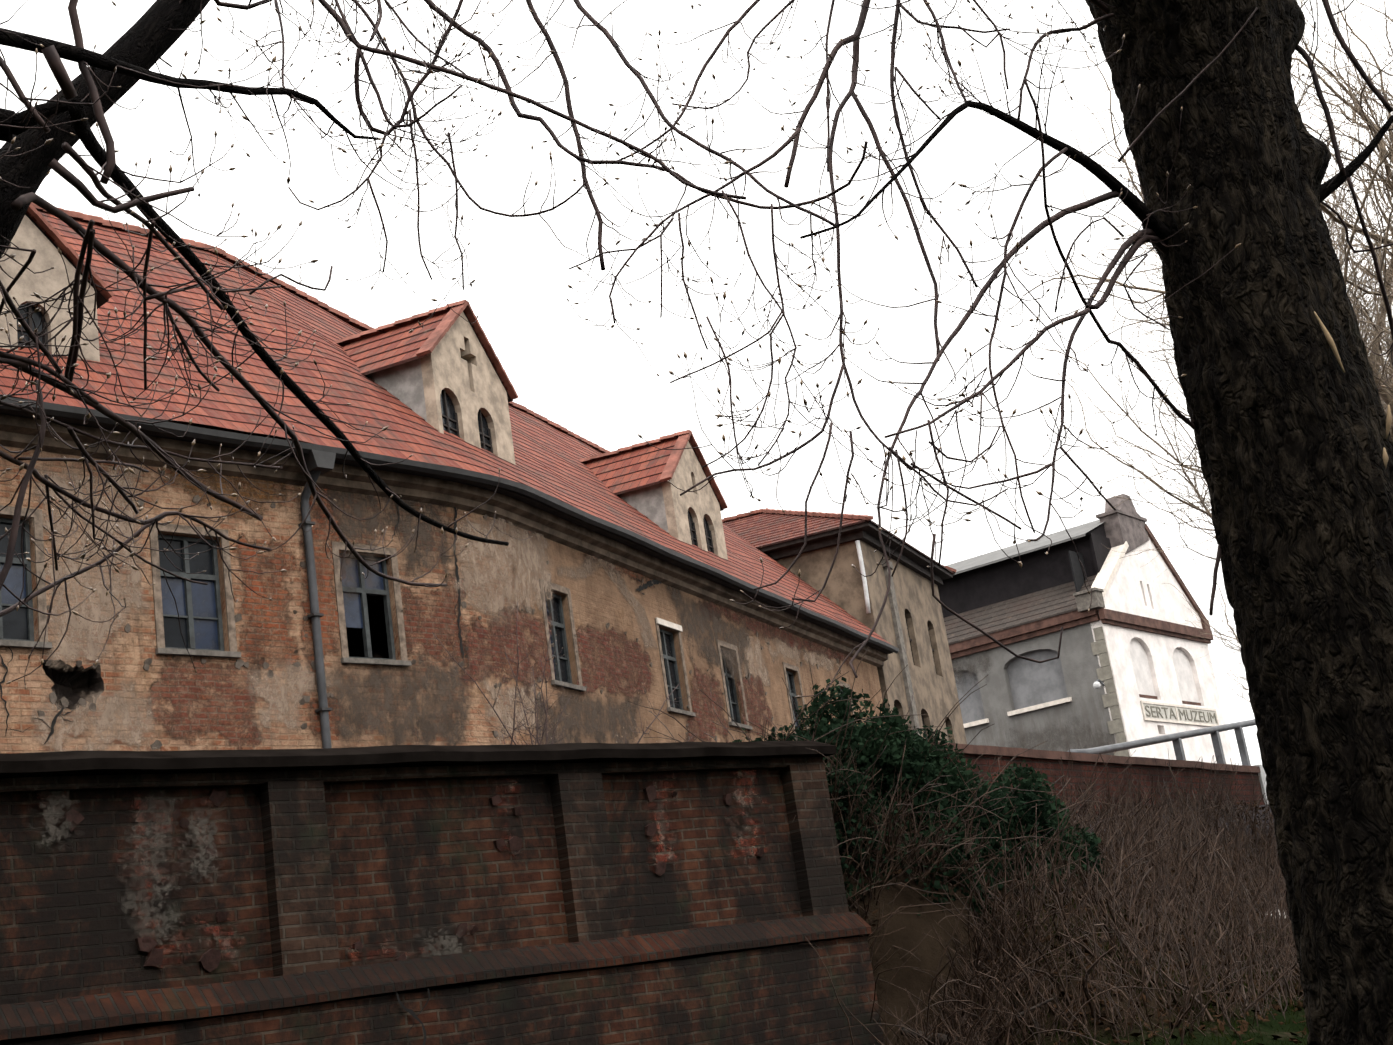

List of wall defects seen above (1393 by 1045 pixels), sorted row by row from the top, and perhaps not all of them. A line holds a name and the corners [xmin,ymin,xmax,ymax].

spalling [37,657,107,716]